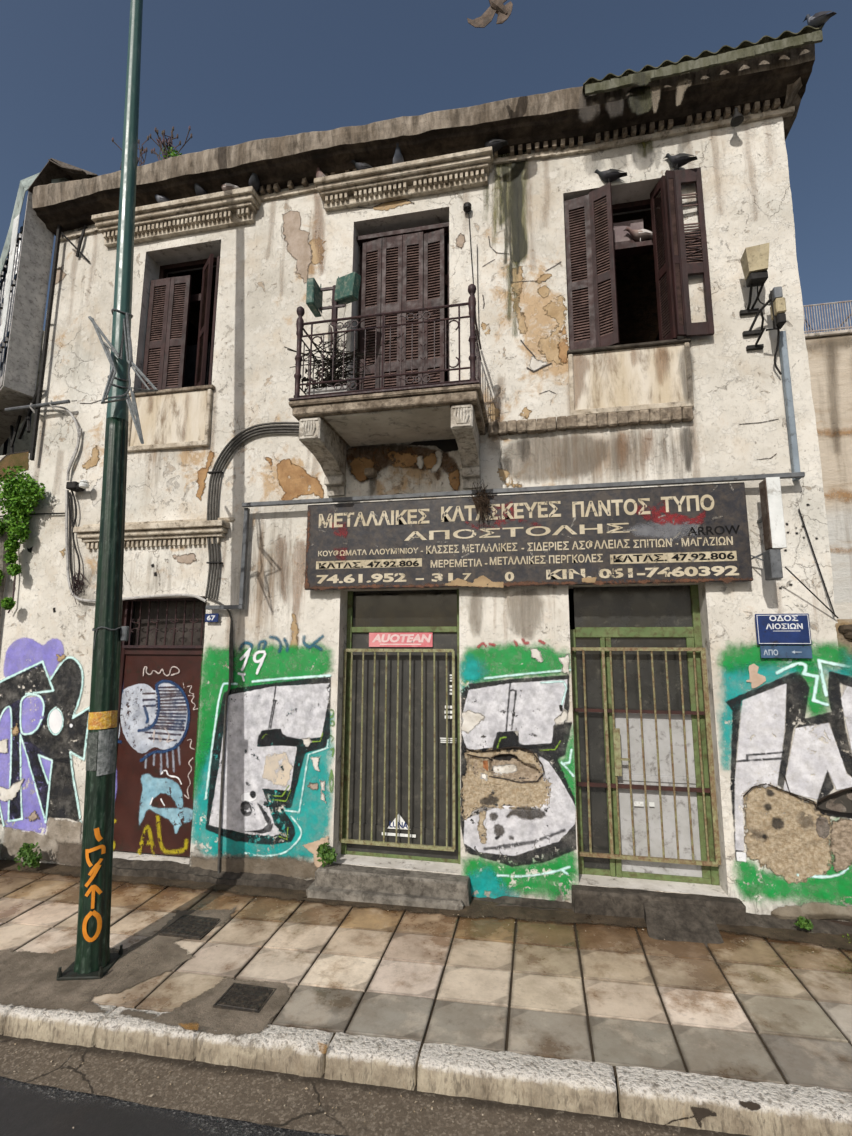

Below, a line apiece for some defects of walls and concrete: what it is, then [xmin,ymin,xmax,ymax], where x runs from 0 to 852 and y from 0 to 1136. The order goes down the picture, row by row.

leakage [496,150,527,266]
peeling [281,211,313,284]
peeling [509,273,569,372]
leakage [820,338,852,381]
peeling [82,445,103,506]
peeling [196,450,214,501]
peeling [265,457,324,500]
peeling [530,648,543,662]
peeling [558,653,570,675]
peeling [554,705,568,725]
flaking render [460,710,552,844]
flaking render [741,783,852,884]